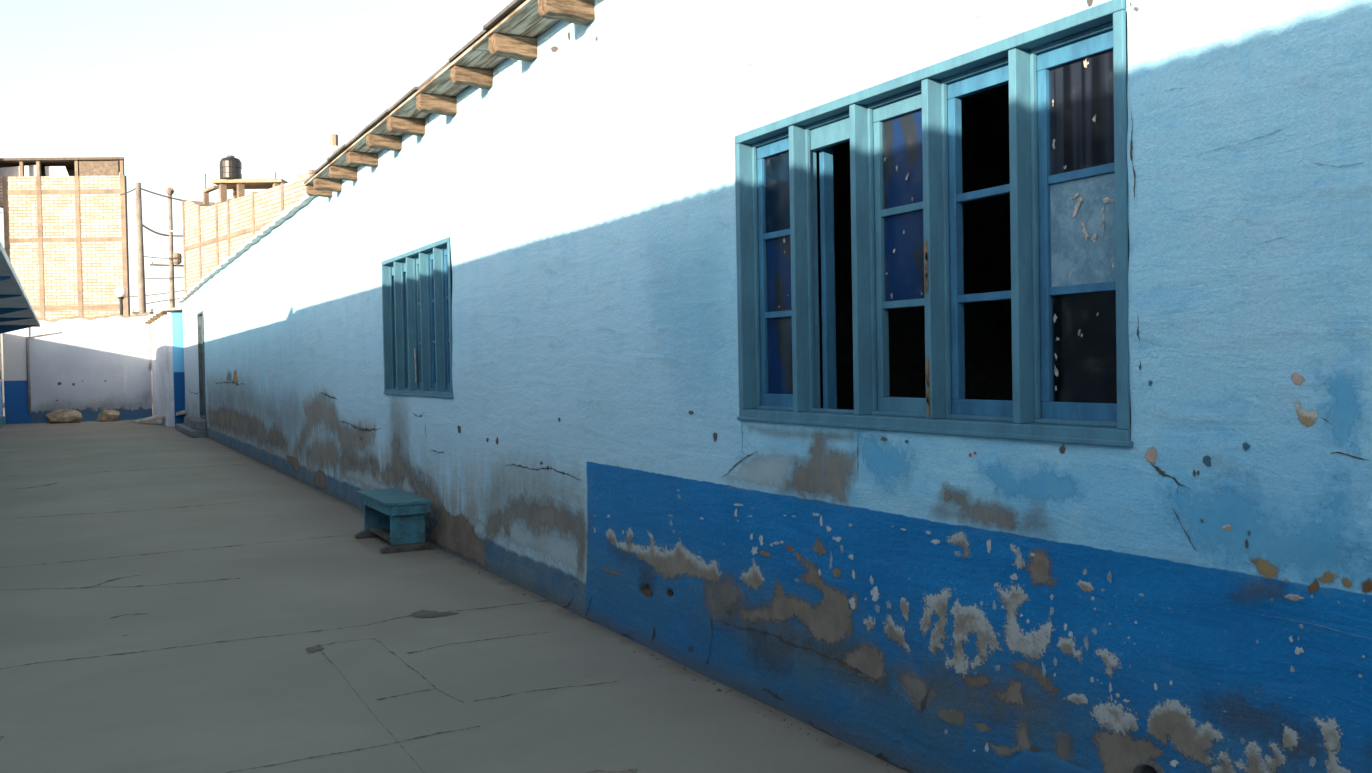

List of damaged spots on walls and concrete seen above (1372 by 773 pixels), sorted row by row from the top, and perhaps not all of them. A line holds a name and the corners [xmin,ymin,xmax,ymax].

crack [505,464,580,480]
damp [486,497,588,571]
peeling [593,504,1300,773]
peeling [1289,624,1304,672]
peeling [1309,716,1351,773]